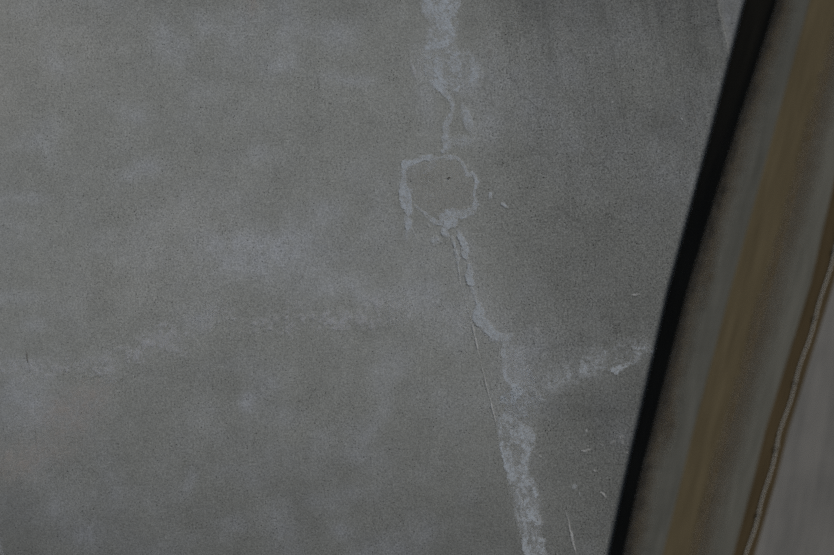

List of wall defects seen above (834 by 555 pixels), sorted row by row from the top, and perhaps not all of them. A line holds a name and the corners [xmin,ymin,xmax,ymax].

damp [399,0,545,555]